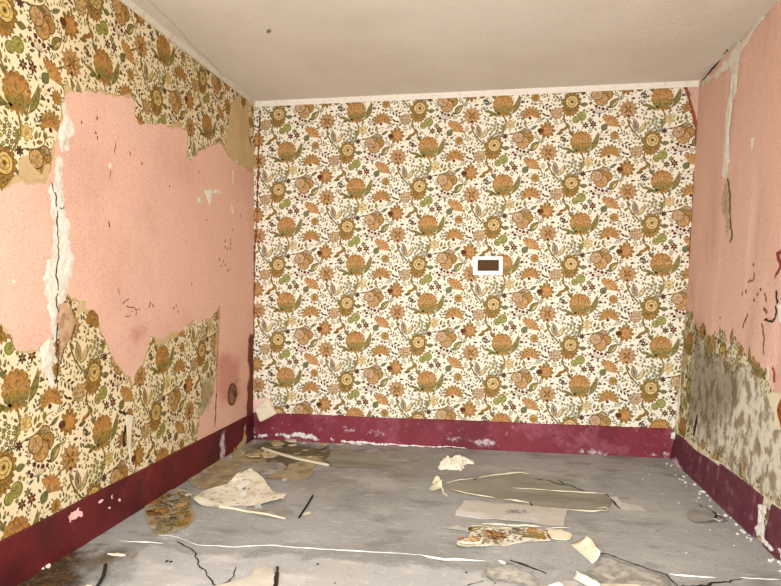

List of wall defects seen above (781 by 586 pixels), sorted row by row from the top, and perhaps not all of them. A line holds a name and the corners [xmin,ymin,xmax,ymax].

spalling [702,16,766,243]
crack [52,183,64,386]
spalling [40,102,82,390]
water stain [689,341,781,502]
crack [177,541,236,586]
crack [509,560,547,574]
crack [601,553,678,586]